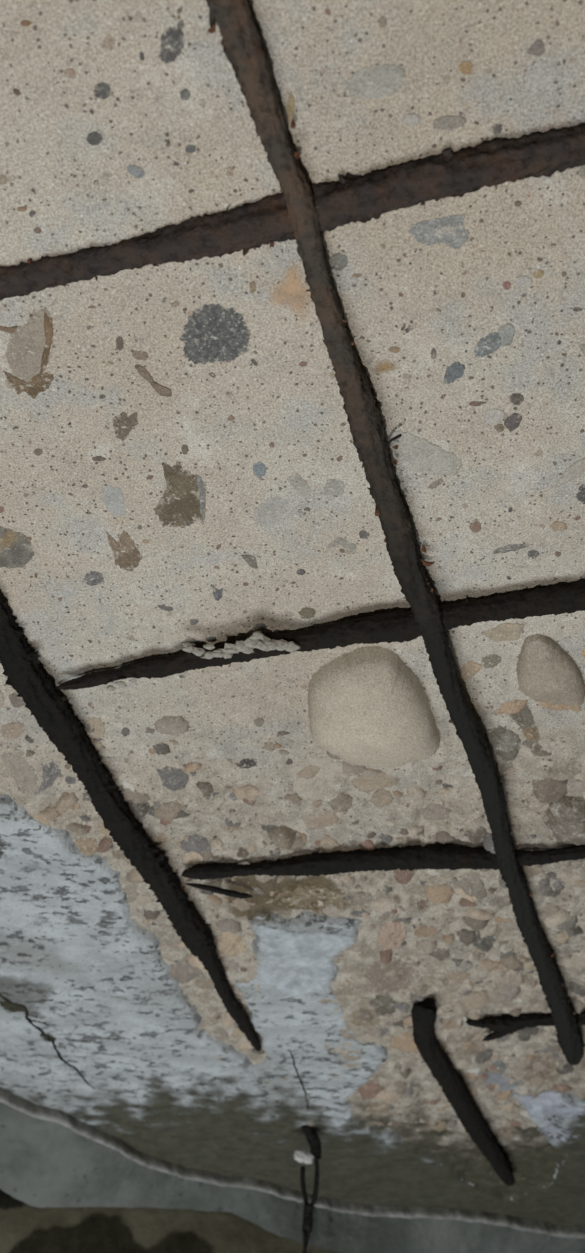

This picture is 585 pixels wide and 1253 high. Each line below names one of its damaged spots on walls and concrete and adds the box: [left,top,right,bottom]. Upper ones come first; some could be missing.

spalling [0,0,296,301]
spalling [206,0,585,1065]
spalling [0,239,499,1065]
crack [0,994,95,1089]
rust [227,875,334,921]
water stain [256,926,354,995]
spalling [266,869,585,1186]
water stain [0,1189,24,1210]
water stain [69,1072,585,1228]